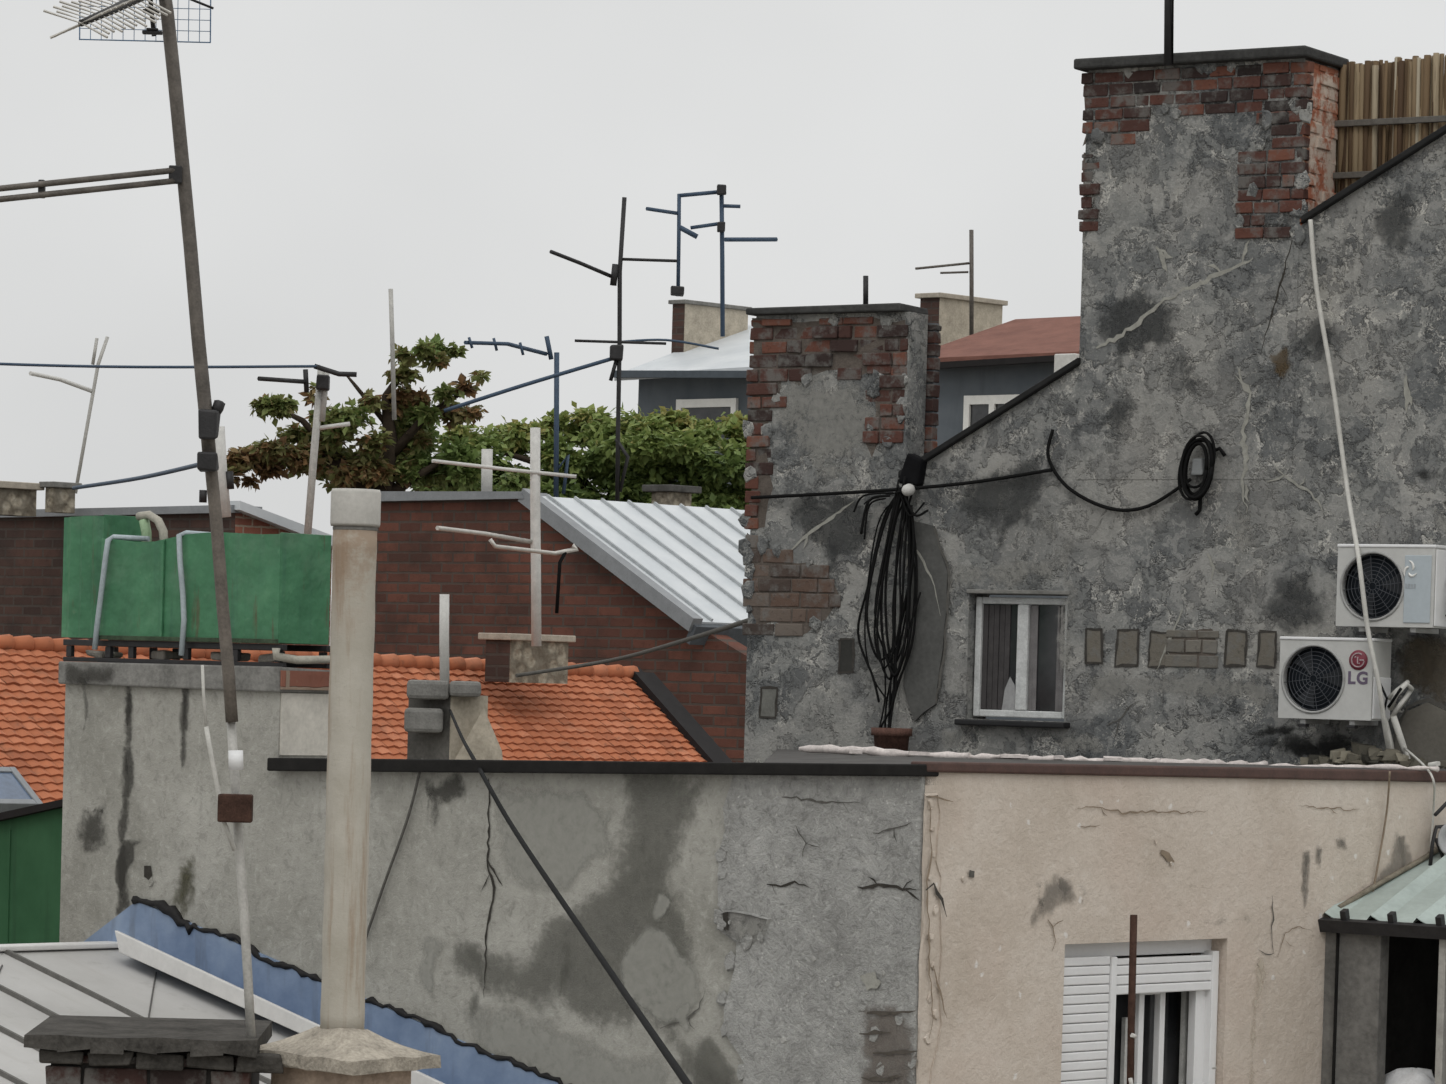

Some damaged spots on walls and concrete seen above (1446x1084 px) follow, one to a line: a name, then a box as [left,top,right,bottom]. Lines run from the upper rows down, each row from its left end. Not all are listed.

flaking render [1078,59,1315,245]
flaking render [738,313,909,636]
flaking render [838,638,855,674]
damp [81,686,136,914]
damp [426,775,462,823]
crack [481,778,503,995]
damp [456,774,695,1021]
crack [767,796,859,892]
crack [857,877,920,901]
crack [875,822,911,840]
crack [1078,806,1208,828]
damp [682,1039,734,1084]